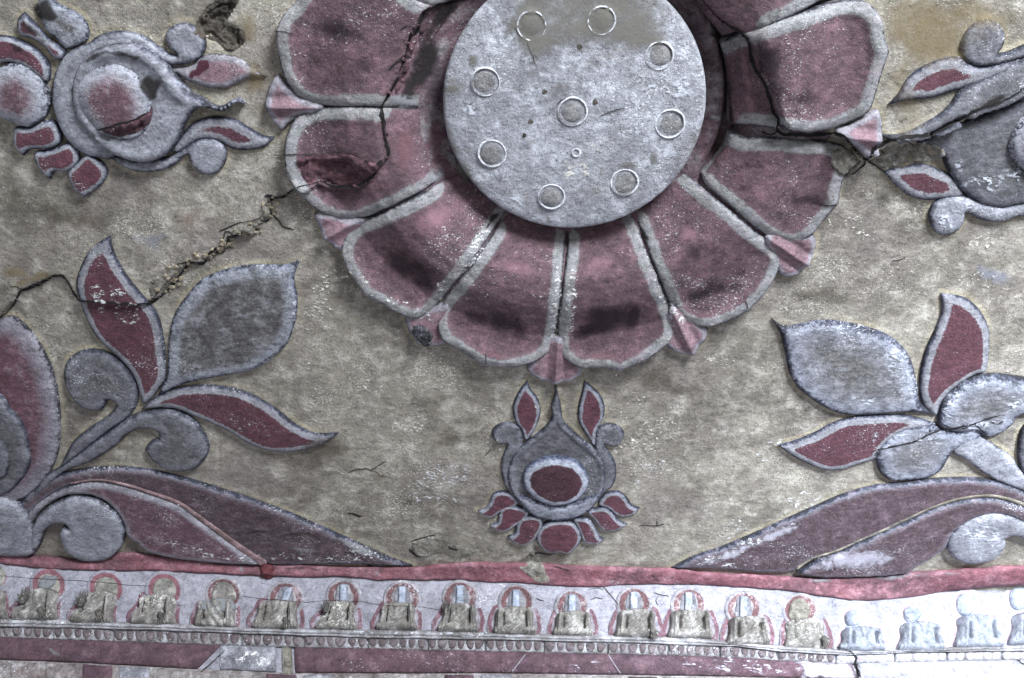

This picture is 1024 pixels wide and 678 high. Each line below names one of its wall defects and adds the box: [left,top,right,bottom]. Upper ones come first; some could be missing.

spalling [194,0,246,51]
crack [702,0,1024,176]
crack [0,0,464,317]
spalling [297,154,380,187]
crack [875,415,1004,455]